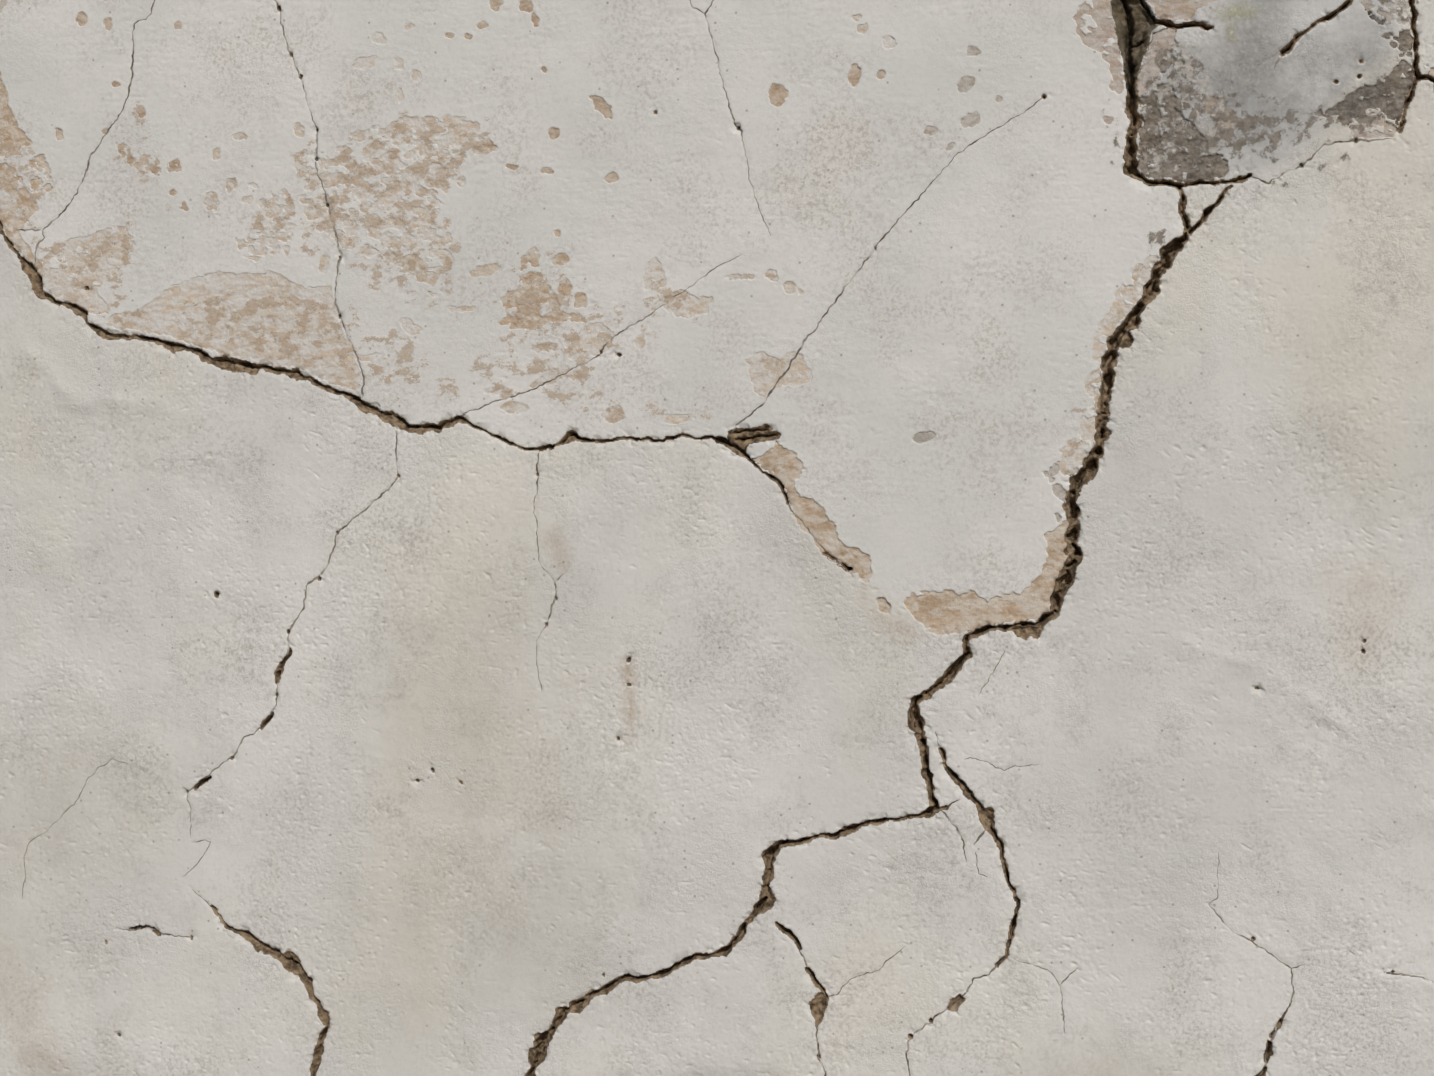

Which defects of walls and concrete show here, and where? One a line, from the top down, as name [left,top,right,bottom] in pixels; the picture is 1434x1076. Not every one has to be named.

peeling [75,12,112,31]
peeling [445,0,539,40]
peeling [589,96,612,119]
spalling [1073,0,1434,183]
peeling [0,32,497,390]
crack [0,0,1047,1076]
peeling [469,230,645,424]
peeling [642,258,713,319]
peeling [745,352,812,397]
peeling [753,442,872,583]
crack [525,0,1434,1076]
peeling [877,229,1165,635]